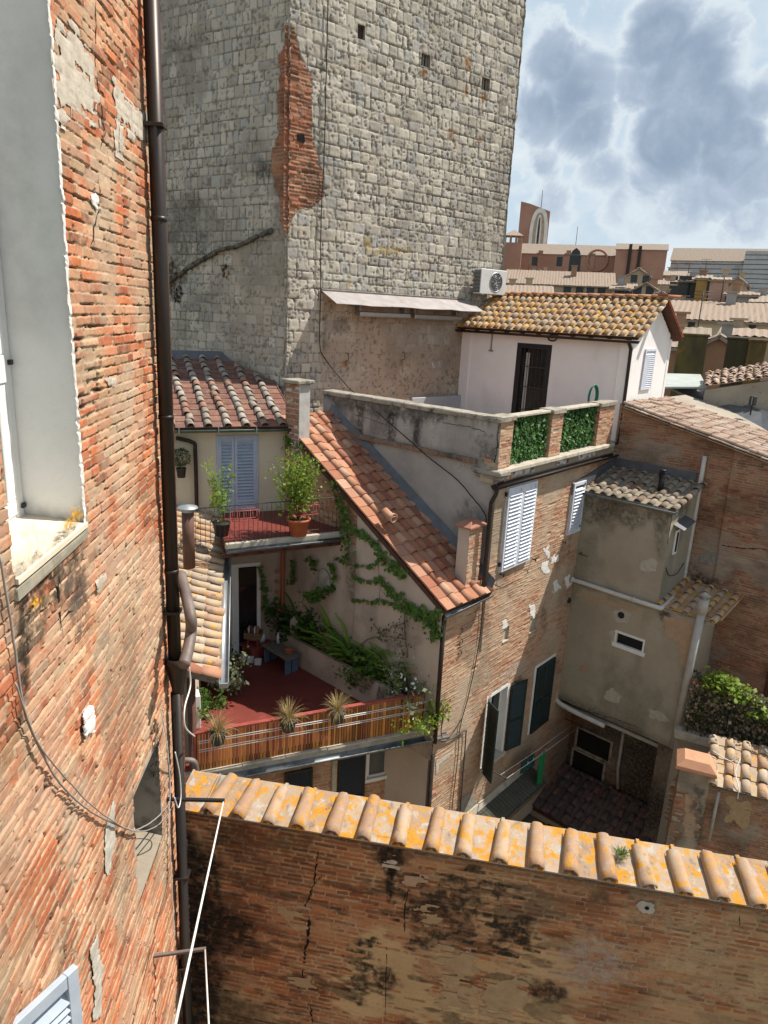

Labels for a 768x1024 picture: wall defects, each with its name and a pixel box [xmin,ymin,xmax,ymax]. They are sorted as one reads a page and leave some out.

peeling [112,76,148,162]
spalling [270,23,325,235]
peeling [47,0,101,523]
crack [298,851,322,1022]
leakage [376,845,403,901]